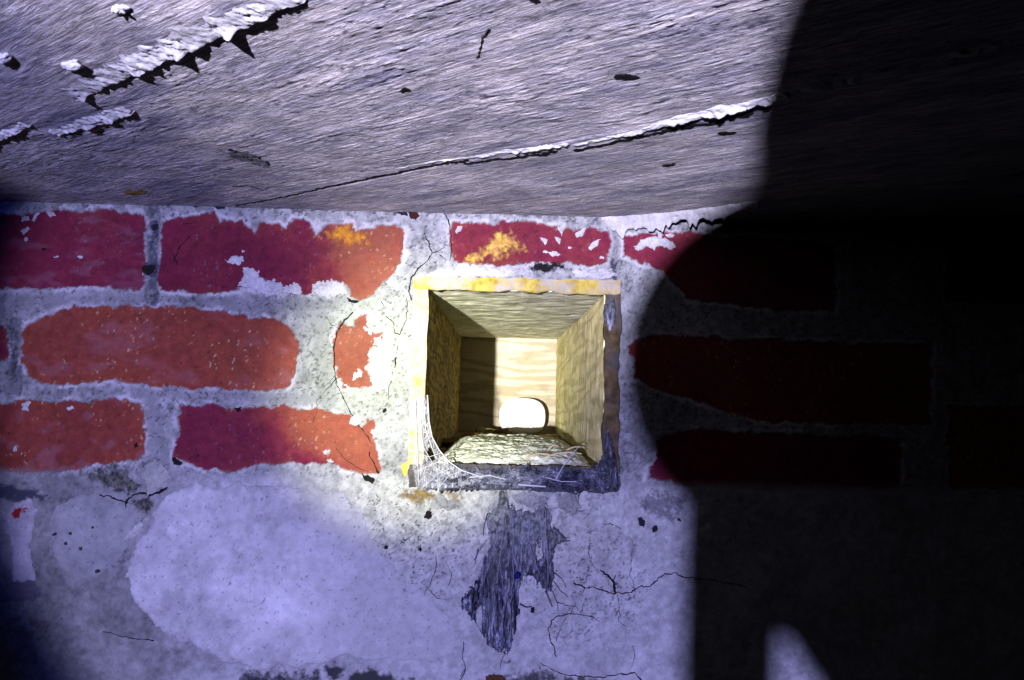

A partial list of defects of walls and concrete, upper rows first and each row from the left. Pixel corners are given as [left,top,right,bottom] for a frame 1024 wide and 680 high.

crack [233,106,768,206]
peeling [21,212,56,241]
peeling [541,221,586,257]
spalling [141,265,156,276]
peeling [312,279,359,303]
crack [381,213,452,400]
peeling [572,256,617,279]
peeling [363,326,385,346]
crack [313,312,380,502]
crack [99,487,168,528]
crack [424,556,452,599]
crack [541,492,746,680]